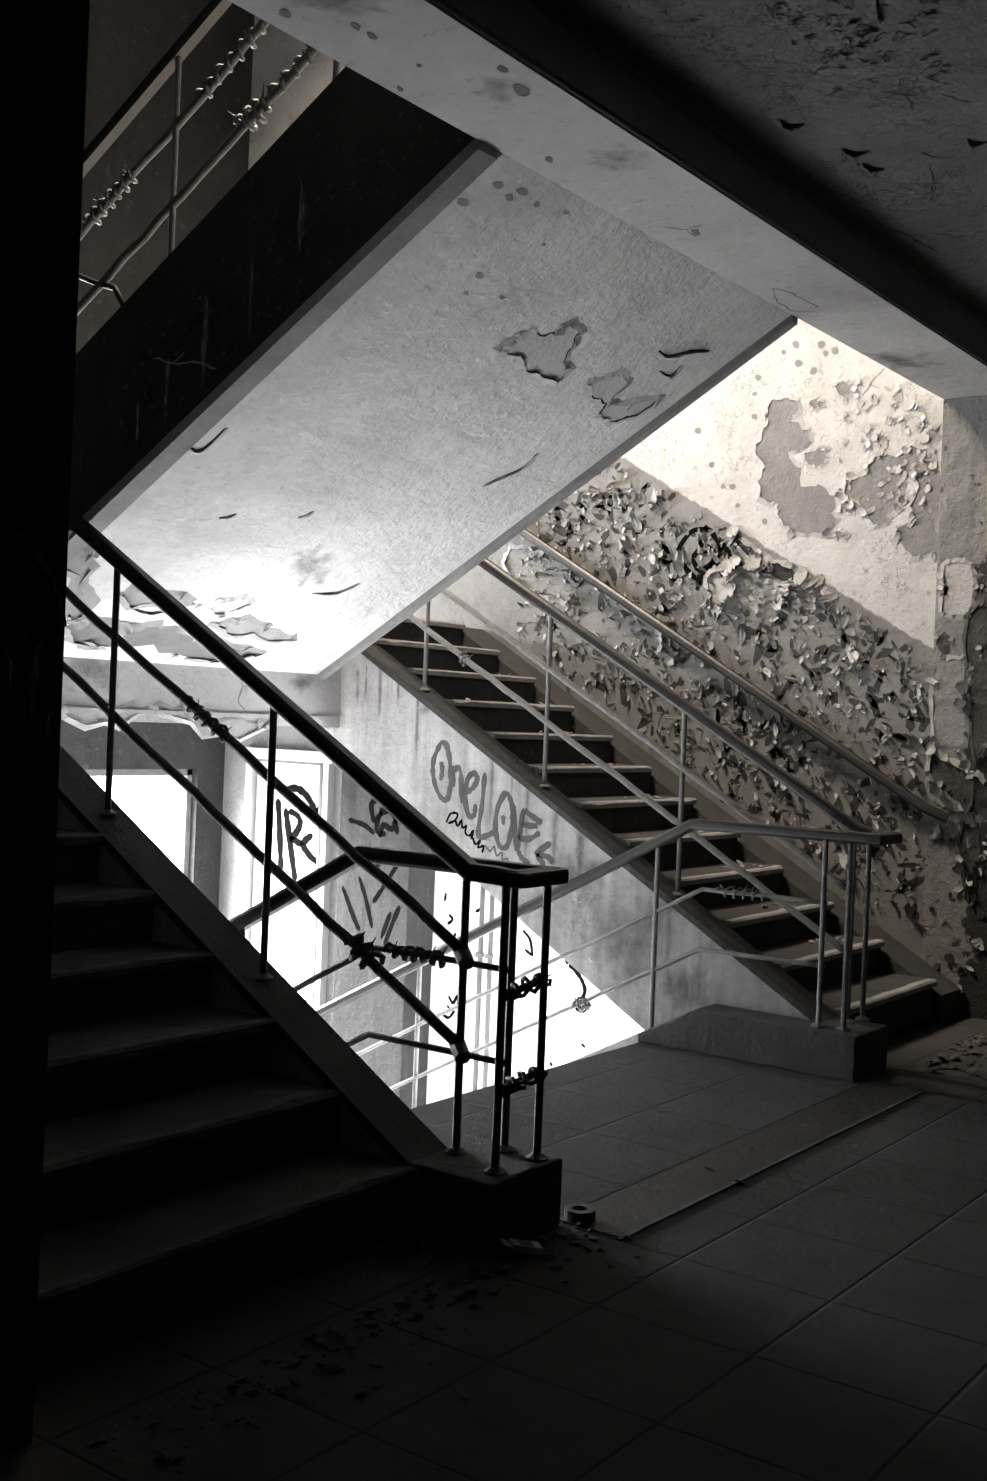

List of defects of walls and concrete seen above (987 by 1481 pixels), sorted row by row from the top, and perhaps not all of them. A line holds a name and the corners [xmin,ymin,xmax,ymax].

peeling [492,316,710,427]
spalling [64,530,298,664]
peeling [501,341,987,923]
peeling [933,953,974,1004]
peeling [971,937,984,951]